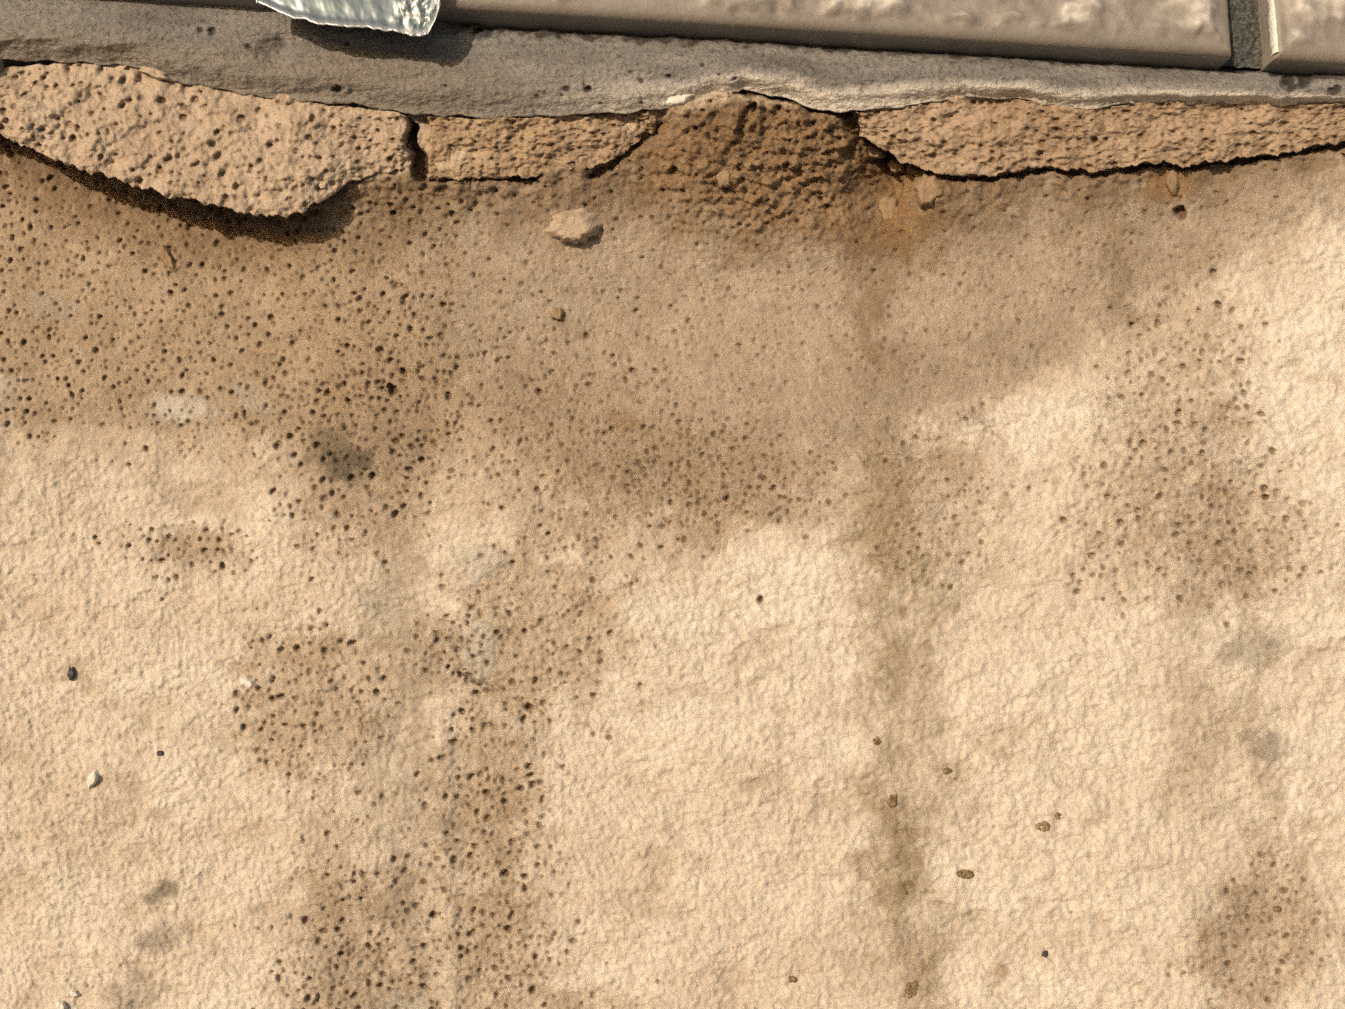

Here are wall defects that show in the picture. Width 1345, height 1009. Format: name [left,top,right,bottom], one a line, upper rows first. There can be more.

crack [738,90,857,141]
crack [407,122,547,187]
crack [589,124,661,178]
crack [919,141,1345,183]
damp [153,395,216,422]